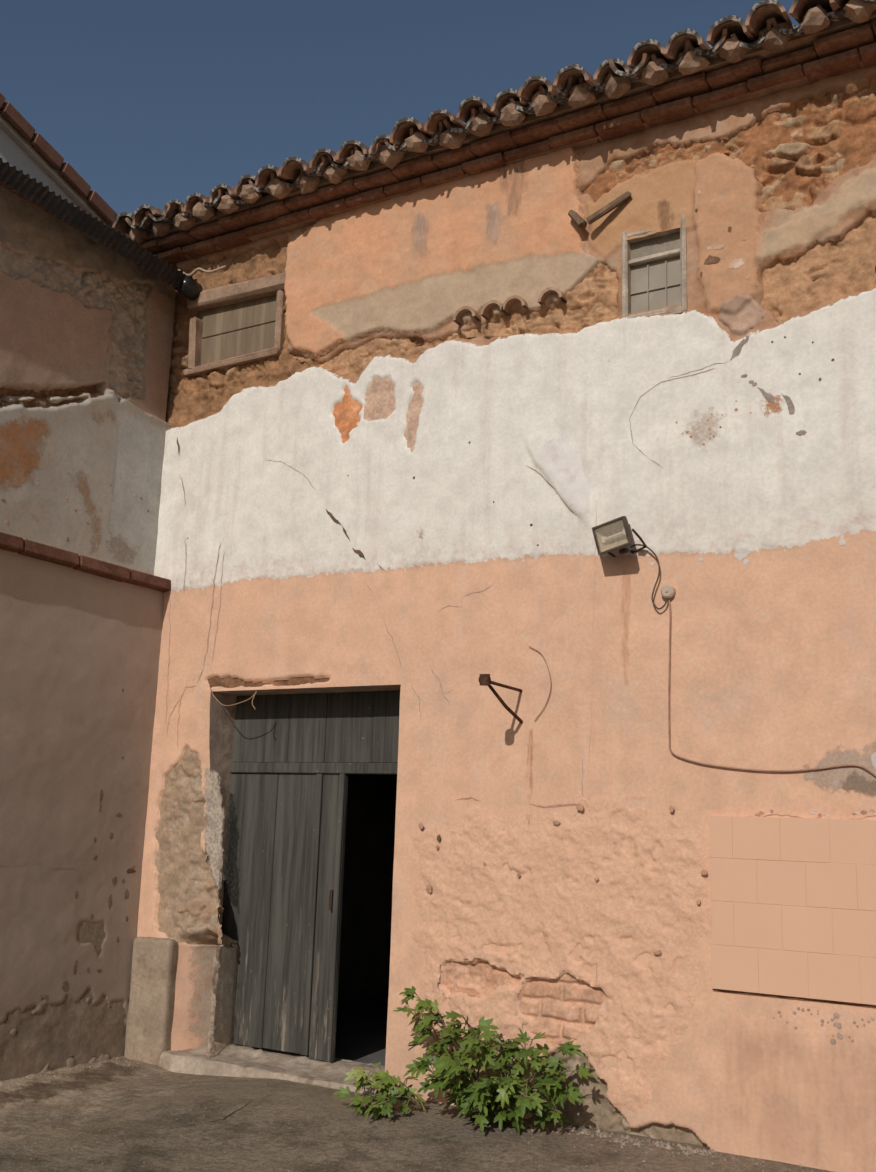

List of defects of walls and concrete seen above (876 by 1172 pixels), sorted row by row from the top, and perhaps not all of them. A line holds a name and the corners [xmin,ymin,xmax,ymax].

spalling [700,226,750,279]
spalling [294,262,618,453]
crack [166,543,225,745]
peeling [805,746,876,815]
peeling [0,866,136,1081]
spalling [445,961,606,1046]